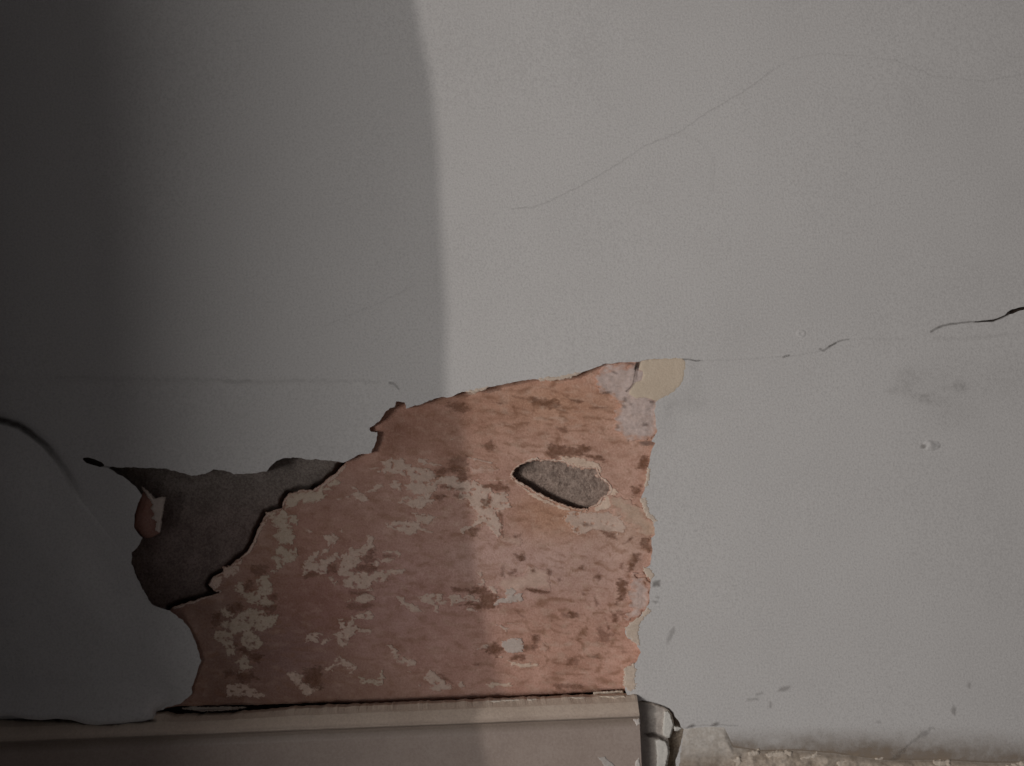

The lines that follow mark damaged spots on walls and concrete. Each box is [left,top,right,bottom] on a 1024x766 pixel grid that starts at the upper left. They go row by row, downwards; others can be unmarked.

crack [975,307,1024,322]
peeling [109,359,1024,766]